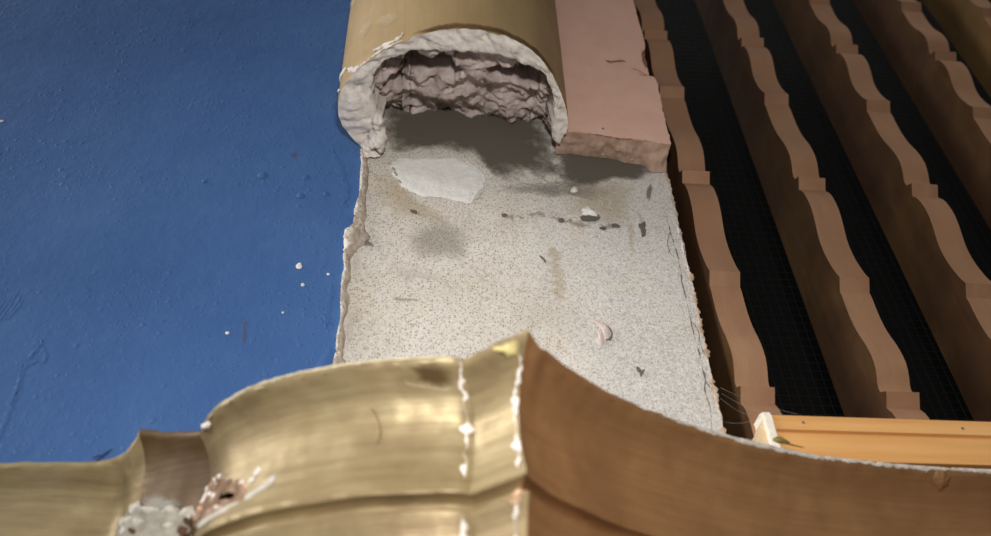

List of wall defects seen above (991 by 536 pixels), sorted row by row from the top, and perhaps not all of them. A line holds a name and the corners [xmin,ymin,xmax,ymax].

spalling [337,24,646,158]
spalling [390,157,486,204]
spalling [580,206,601,221]
spalling [115,467,276,536]